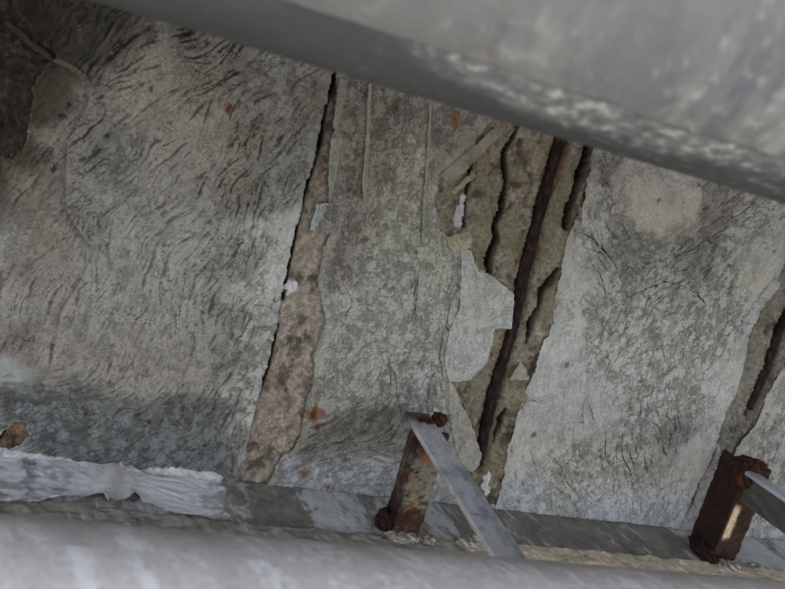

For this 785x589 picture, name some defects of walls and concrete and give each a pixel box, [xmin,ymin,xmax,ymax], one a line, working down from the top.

spalling [0,0,91,160]
spalling [239,70,348,483]
spalling [434,119,596,505]
crack [561,145,715,306]
spalling [701,262,785,480]